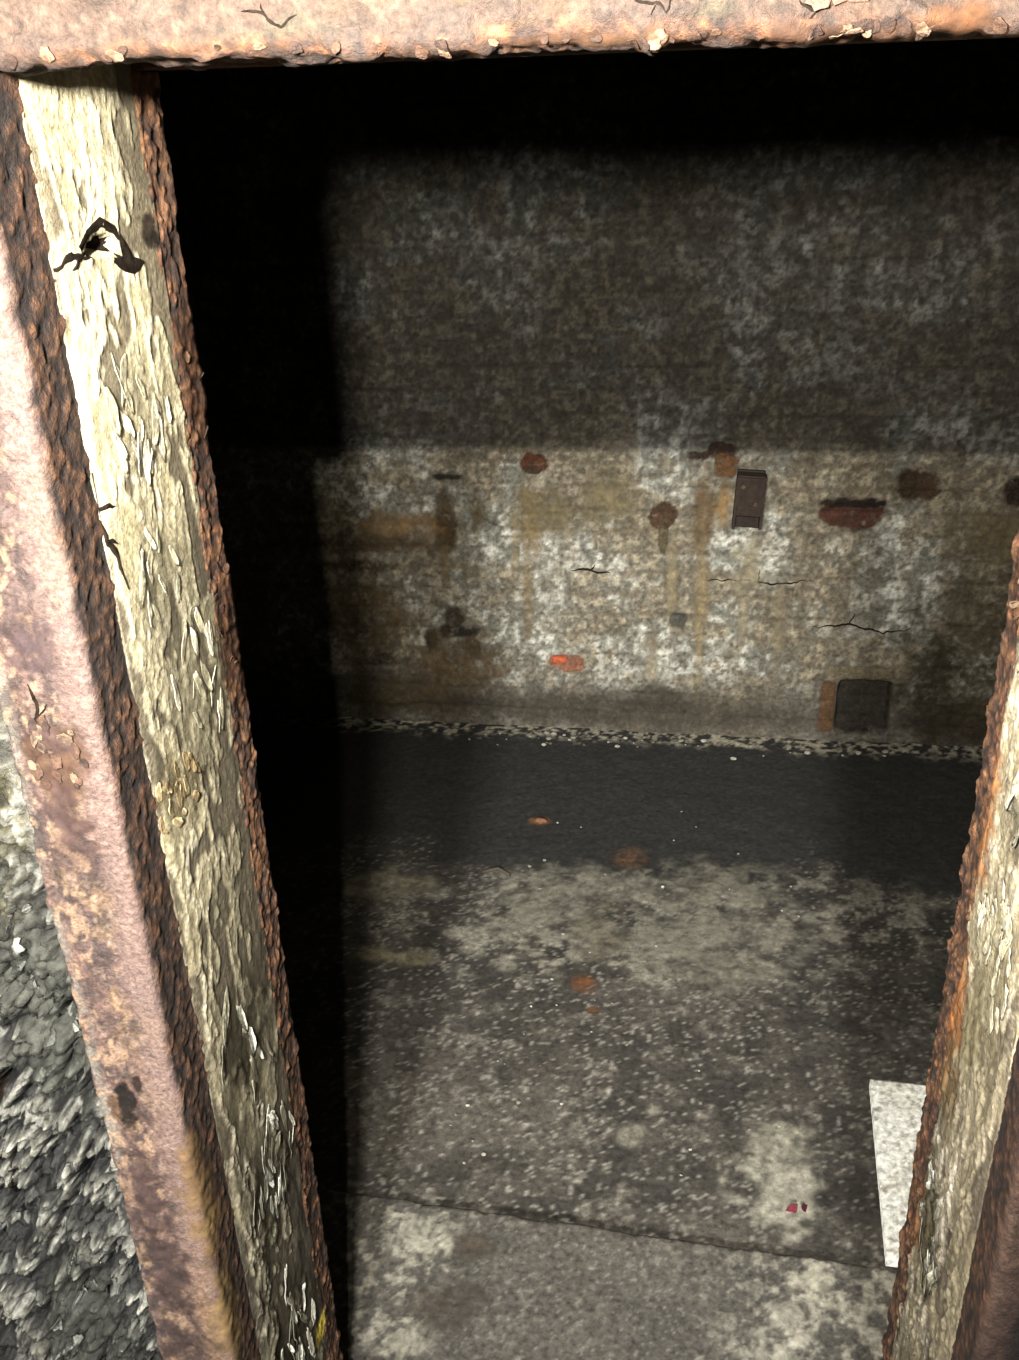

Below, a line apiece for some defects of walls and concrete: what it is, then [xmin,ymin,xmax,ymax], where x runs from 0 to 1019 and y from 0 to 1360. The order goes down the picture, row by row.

rust [39,46,55,63]
rust [101,46,127,63]
crack [241,3,297,29]
rust [415,38,452,60]
rust [540,30,611,46]
crack [635,0,671,14]
rust [627,27,722,56]
rust [781,0,939,42]
rust [990,17,1007,35]
rust [23,715,93,855]
rust [179,1132,218,1235]
rust [130,1153,240,1360]